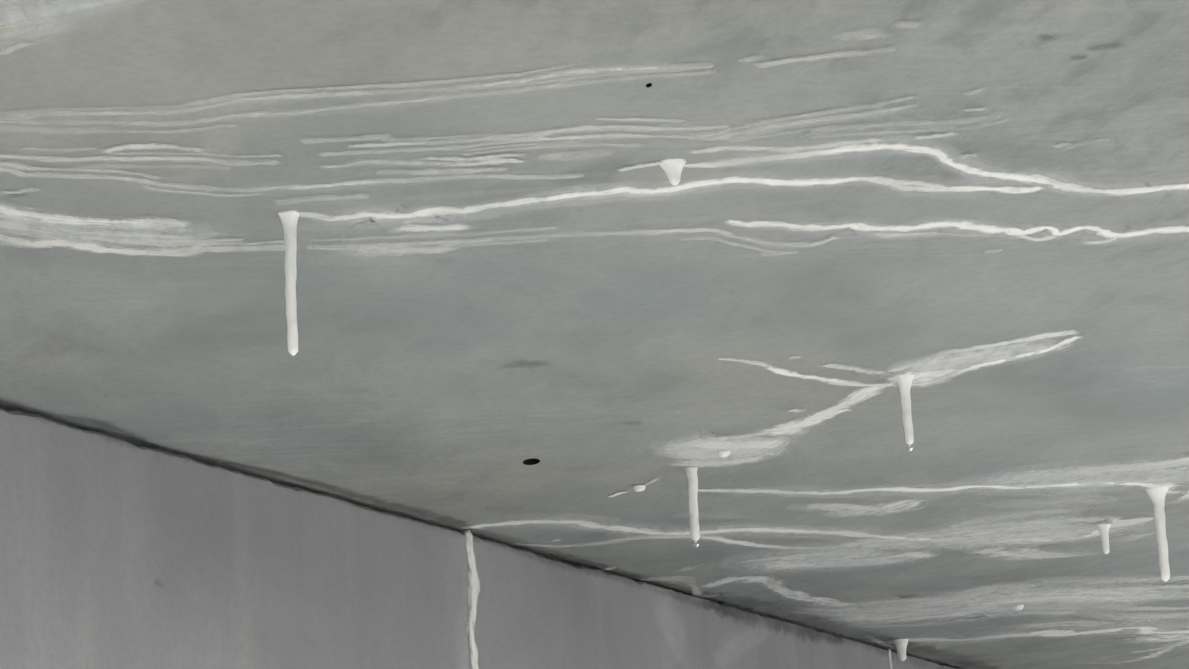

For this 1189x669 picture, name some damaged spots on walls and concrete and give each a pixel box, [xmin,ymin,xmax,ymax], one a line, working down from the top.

damp [476,66,685,87]
damp [0,189,209,256]
damp [305,181,373,197]
crack [299,139,1189,232]
crack [726,220,1189,244]
damp [664,330,1081,466]
damp [806,497,928,517]
damp [701,517,1189,632]